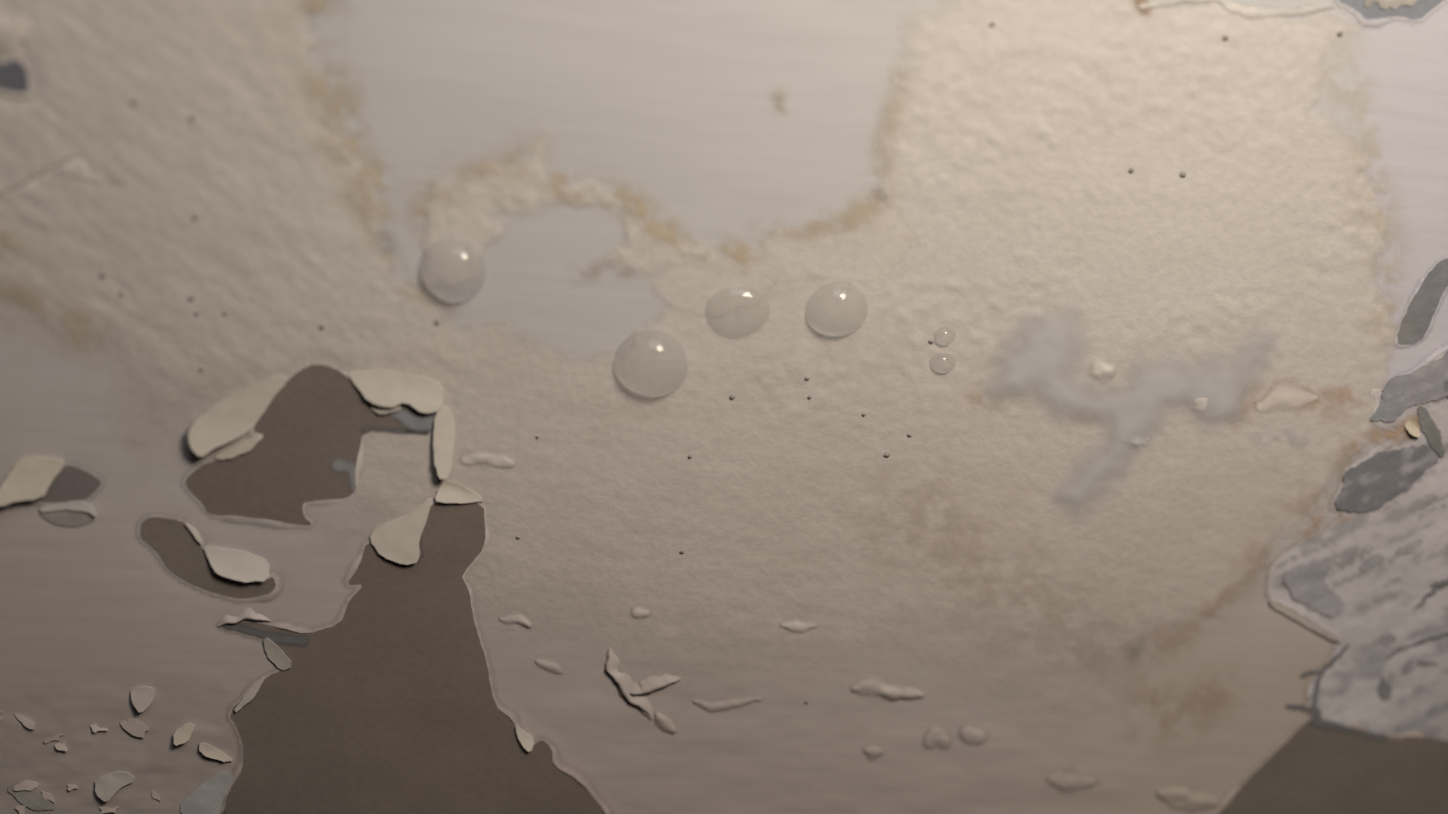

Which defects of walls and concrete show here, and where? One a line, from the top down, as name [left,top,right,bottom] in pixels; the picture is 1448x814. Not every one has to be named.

peeling [1336,0,1448,27]
flaking render [0,14,34,99]
leakage [0,0,453,408]
leakage [336,0,1395,676]
peeling [1405,421,1420,437]
peeling [0,457,104,527]
peeling [136,363,613,814]
peeling [0,711,68,751]
peeling [7,780,78,814]
peeling [95,771,135,814]
peeling [90,686,155,738]
peeling [1212,716,1448,814]